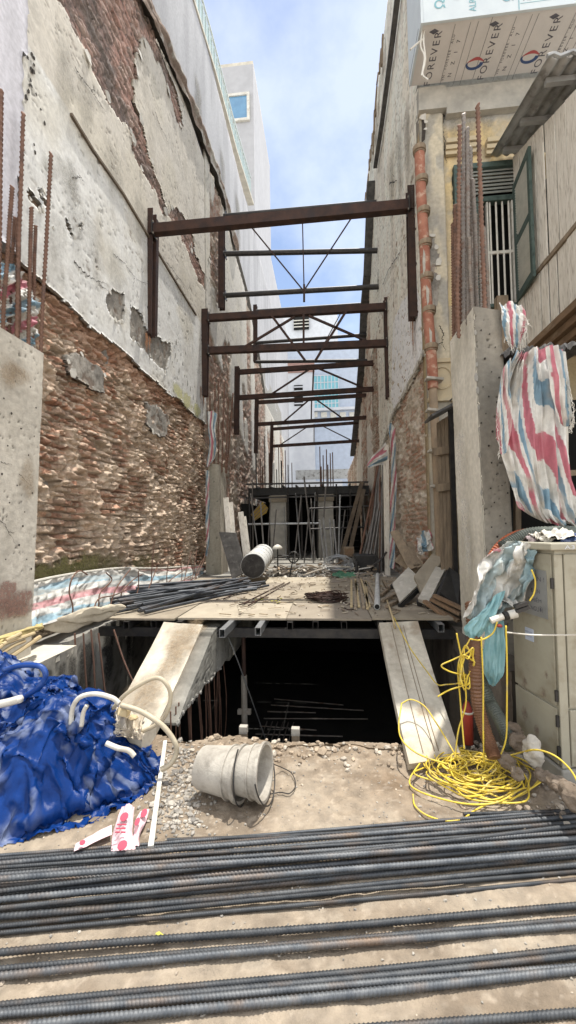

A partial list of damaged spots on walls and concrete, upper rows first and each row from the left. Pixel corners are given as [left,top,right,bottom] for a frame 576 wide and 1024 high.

peeling [57,0,185,221]
peeling [181,234,218,299]
flaking render [106,289,194,400]